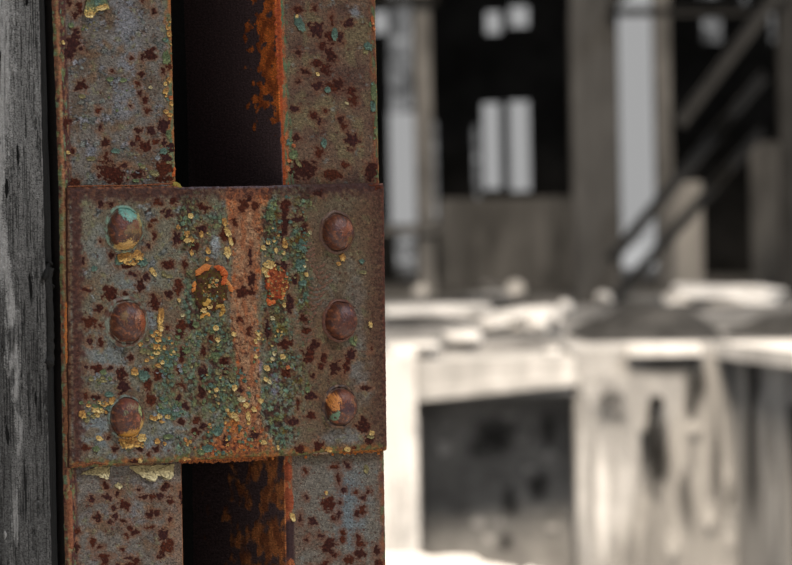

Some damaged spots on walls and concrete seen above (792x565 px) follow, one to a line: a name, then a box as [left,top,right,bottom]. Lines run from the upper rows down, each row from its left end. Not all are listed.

peeling [68,0,110,31]
corrosion [308,22,357,106]
corrosion [68,143,182,188]
corrosion [289,160,342,183]
peeling [115,250,173,278]
peeling [176,213,211,261]
peeling [222,218,233,258]
corrosion [236,271,255,298]
peeling [260,205,312,308]
corrosion [81,286,117,328]
corrosion [116,367,131,395]
peeling [118,308,295,482]